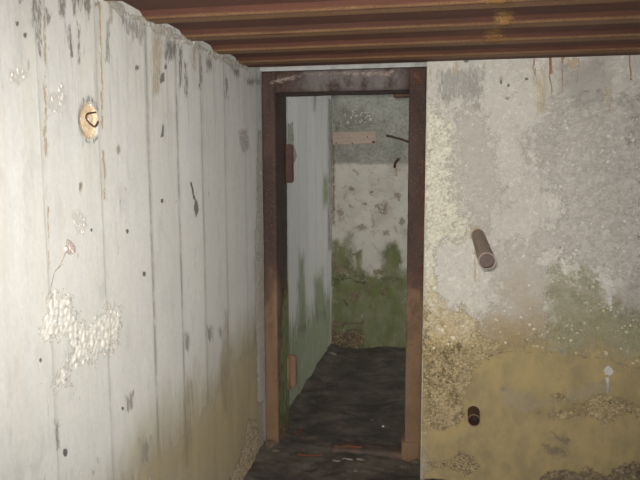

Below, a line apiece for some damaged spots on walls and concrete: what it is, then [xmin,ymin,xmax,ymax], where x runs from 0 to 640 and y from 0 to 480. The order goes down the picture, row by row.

leakage [32,0,51,55]
leakage [73,0,97,19]
spalling [107,1,248,70]
corrosion [481,0,515,44]
leakage [160,41,188,95]
leakage [373,244,400,280]
spalling [422,101,501,431]
leakage [421,276,640,480]
leakage [132,333,261,480]
spalling [541,461,640,480]